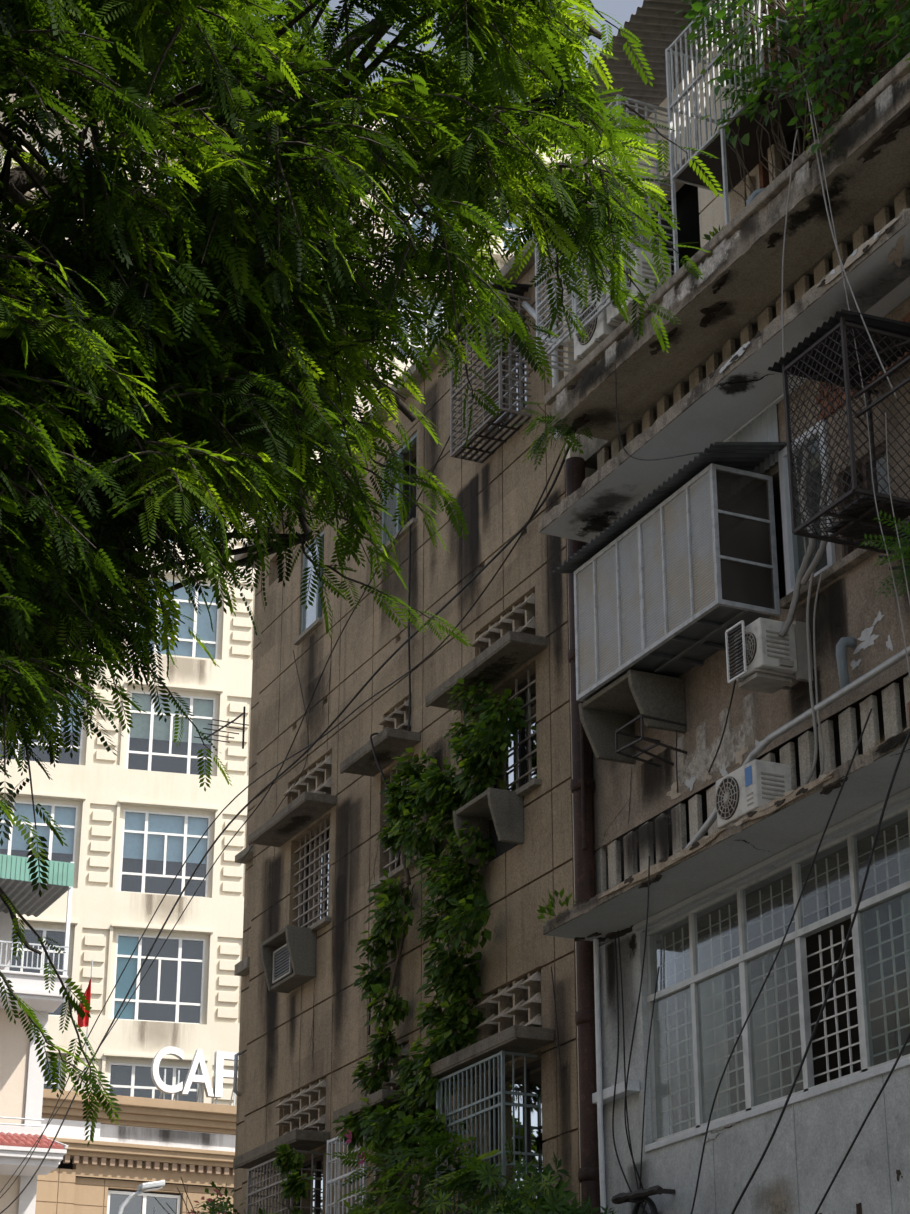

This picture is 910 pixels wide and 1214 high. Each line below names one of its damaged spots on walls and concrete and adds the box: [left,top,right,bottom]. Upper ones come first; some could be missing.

leakage [787,79,910,234]
leakage [715,374,773,395]
leakage [548,491,558,512]
leakage [577,493,630,537]
leakage [547,535,561,663]
peeling [850,611,893,670]